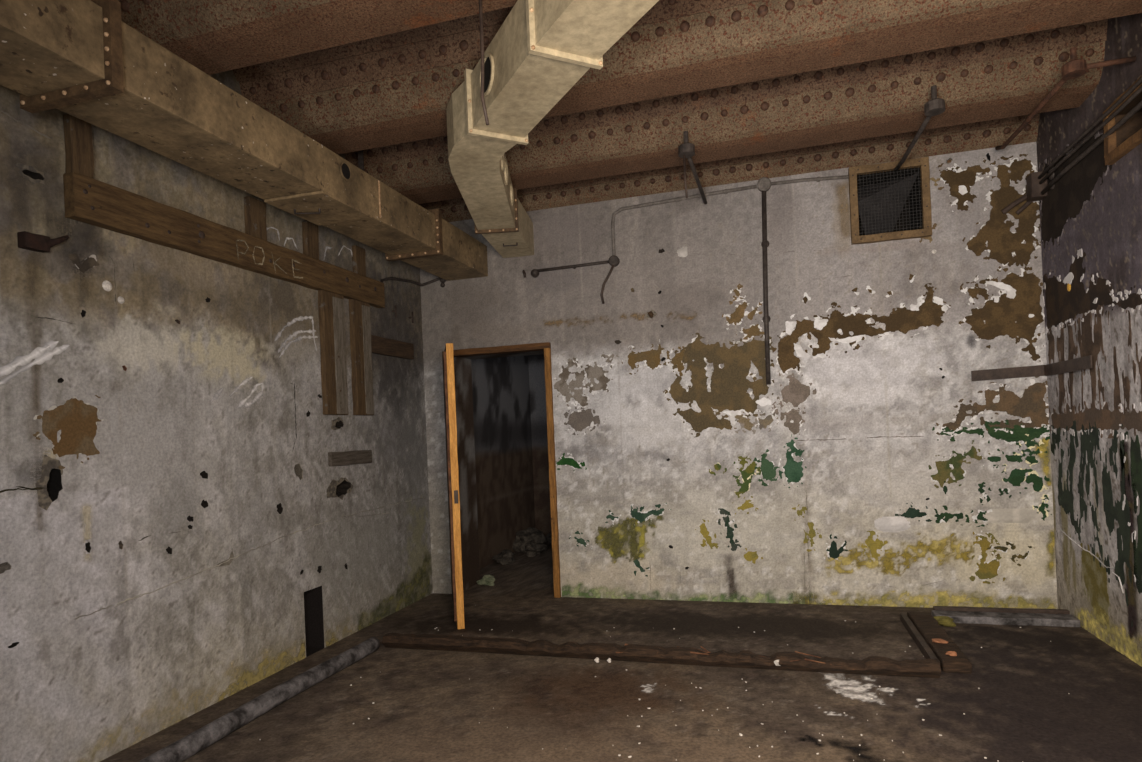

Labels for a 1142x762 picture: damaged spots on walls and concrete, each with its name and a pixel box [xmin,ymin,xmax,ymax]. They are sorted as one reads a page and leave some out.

peeling [33,395,104,511]
peeling [554,274,951,566]
peeling [895,129,1142,626]
spalling [932,638,957,656]